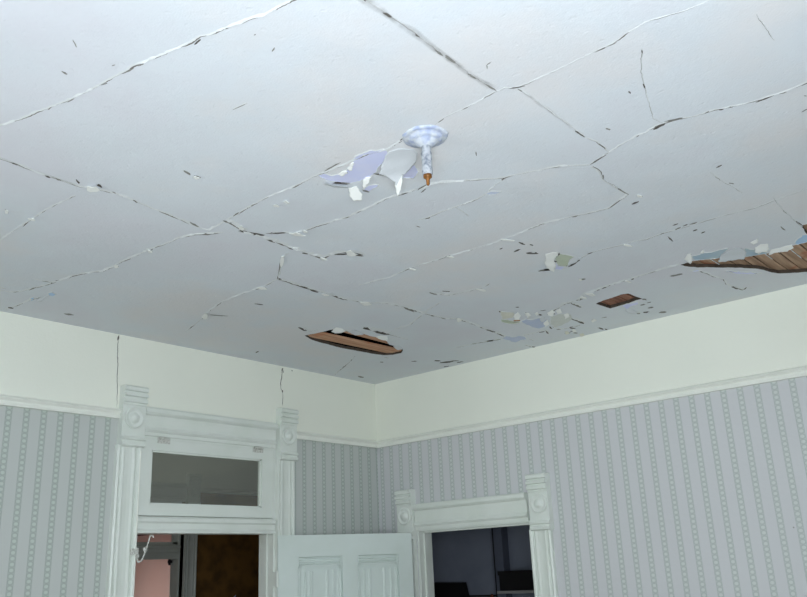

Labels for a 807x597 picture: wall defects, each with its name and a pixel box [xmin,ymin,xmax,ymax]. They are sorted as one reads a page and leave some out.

peeling [318,148,420,201]
crack [0,0,807,348]
peeling [514,242,582,272]
flaking render [682,223,807,274]
crack [114,336,122,405]
flaking render [305,327,403,363]
peeling [489,294,666,347]